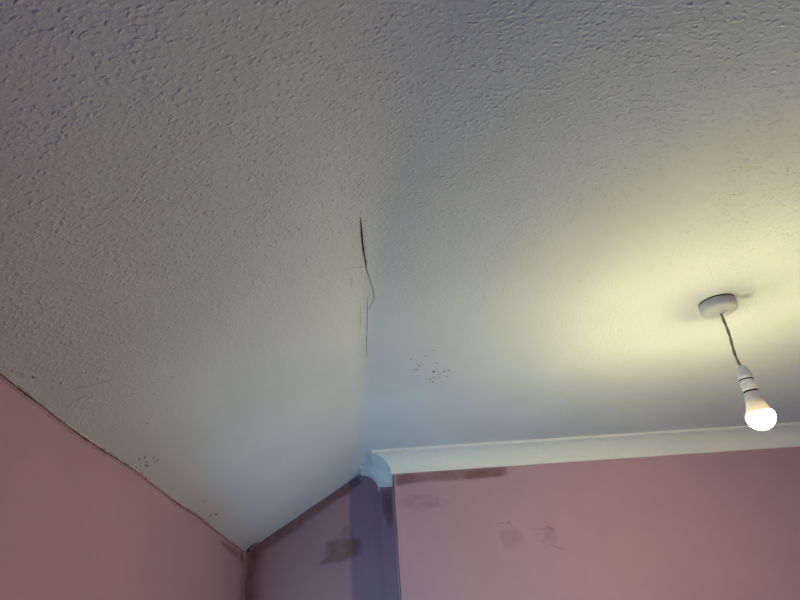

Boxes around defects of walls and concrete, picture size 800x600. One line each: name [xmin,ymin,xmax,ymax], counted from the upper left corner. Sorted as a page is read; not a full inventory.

crack [350,217,375,357]